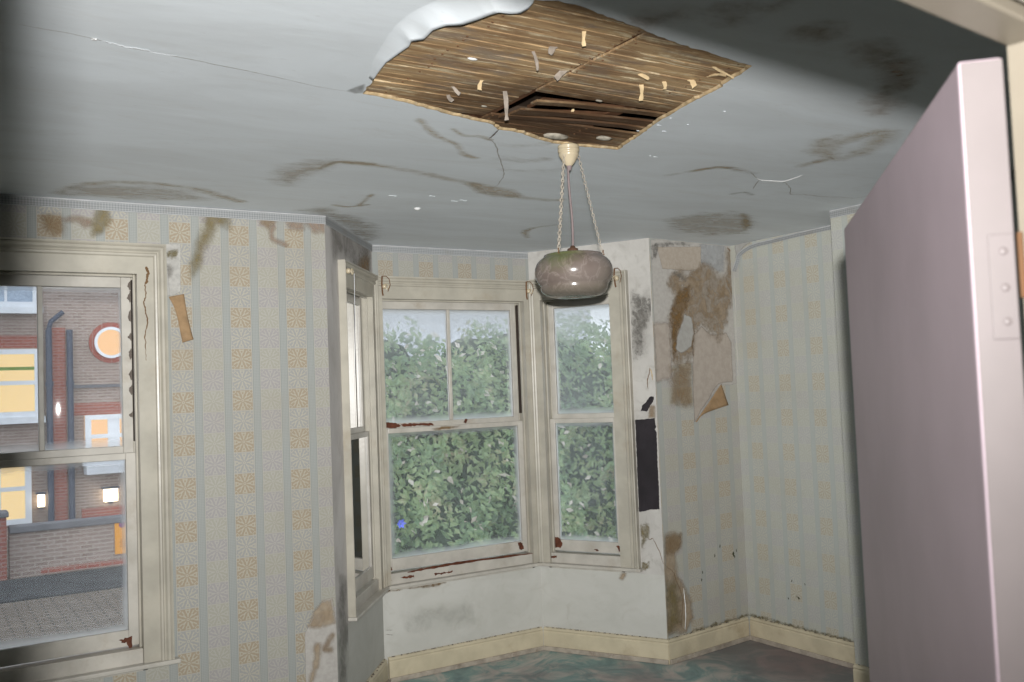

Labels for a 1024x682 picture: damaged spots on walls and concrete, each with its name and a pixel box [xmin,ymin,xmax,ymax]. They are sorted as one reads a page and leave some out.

flaking render [363,0,751,150]
crack [477,129,505,187]
water stain [45,210,108,233]
water stain [192,217,226,268]
water stain [290,204,369,270]
crack [142,267,150,361]
water stain [633,297,651,344]
flaking render [651,225,831,421]
water stain [665,533,693,633]
flaking render [305,598,338,682]